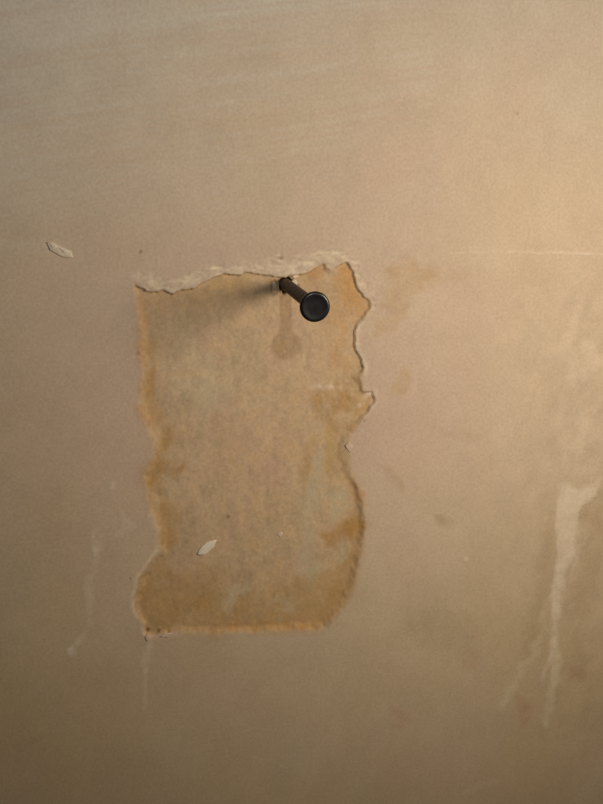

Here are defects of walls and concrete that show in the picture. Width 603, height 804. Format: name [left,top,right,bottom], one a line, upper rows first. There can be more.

flaking render [127,244,380,644]
damp [493,474,603,732]